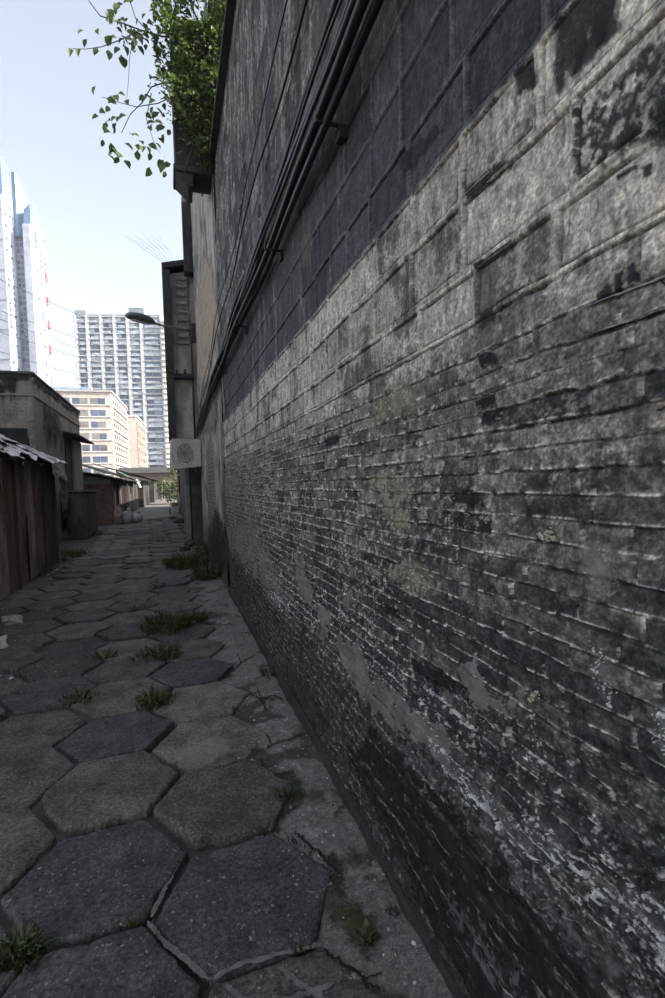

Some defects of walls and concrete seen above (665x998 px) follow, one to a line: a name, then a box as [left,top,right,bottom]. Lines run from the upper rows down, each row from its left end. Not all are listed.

damp [588,640,618,708]
damp [651,708,665,756]
crack [147,860,380,998]
crack [294,832,339,875]
damp [326,852,380,959]
damp [347,721,665,998]